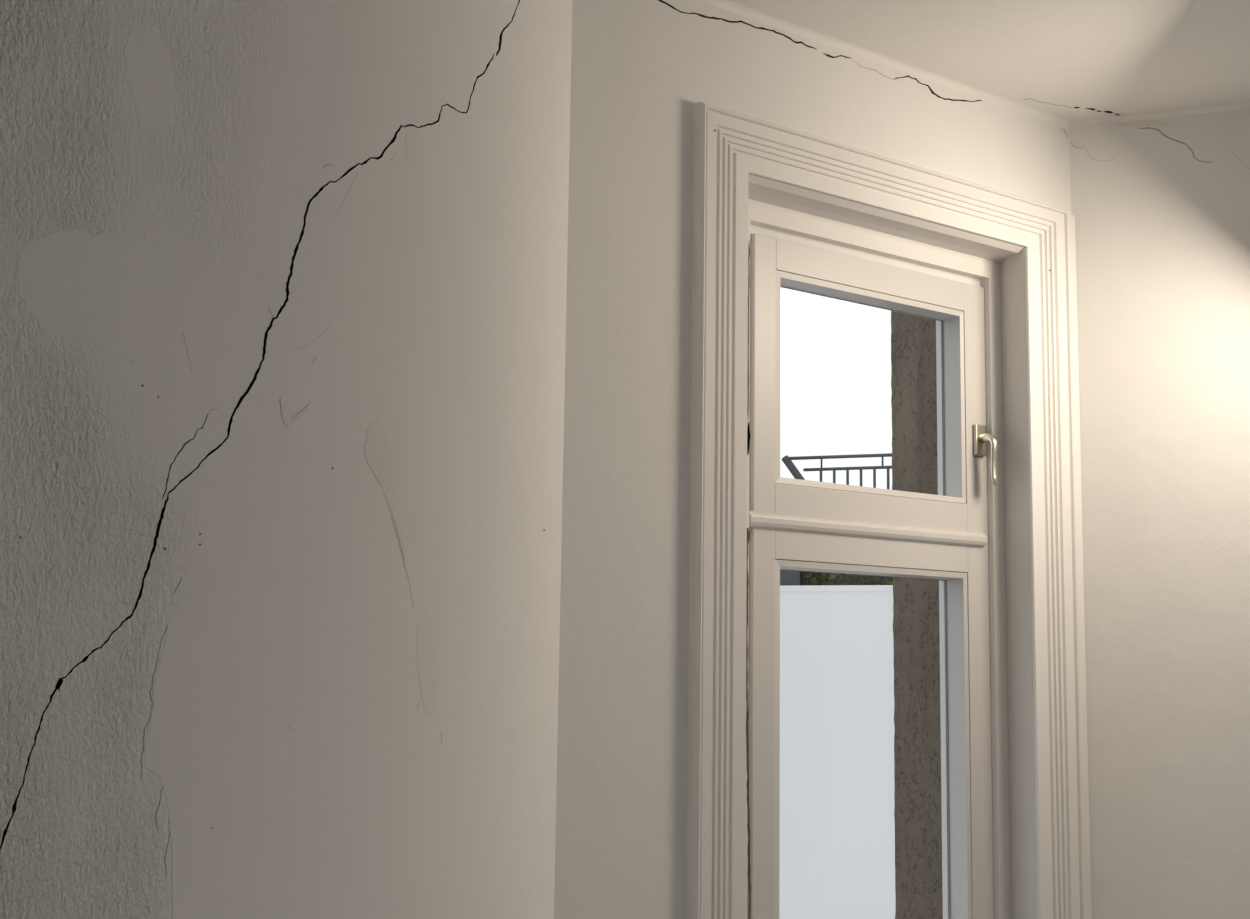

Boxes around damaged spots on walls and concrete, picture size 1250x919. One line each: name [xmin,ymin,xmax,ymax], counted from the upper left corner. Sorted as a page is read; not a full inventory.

crack [658,0,982,102]
crack [1023,98,1250,169]
crack [0,0,520,876]